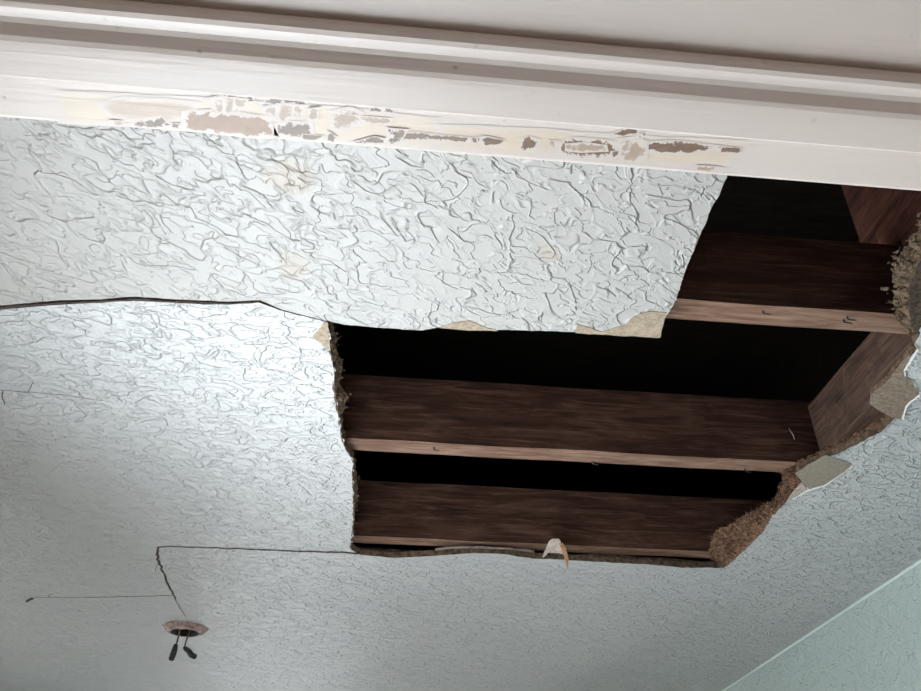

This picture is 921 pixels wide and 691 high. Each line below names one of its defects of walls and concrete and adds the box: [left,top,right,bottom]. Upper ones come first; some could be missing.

peeling [57,90,750,172]
crack [0,298,325,322]
peeling [440,320,498,331]
peeling [575,311,667,338]
crack [0,382,102,405]
peeling [787,455,852,501]
crack [26,546,359,617]